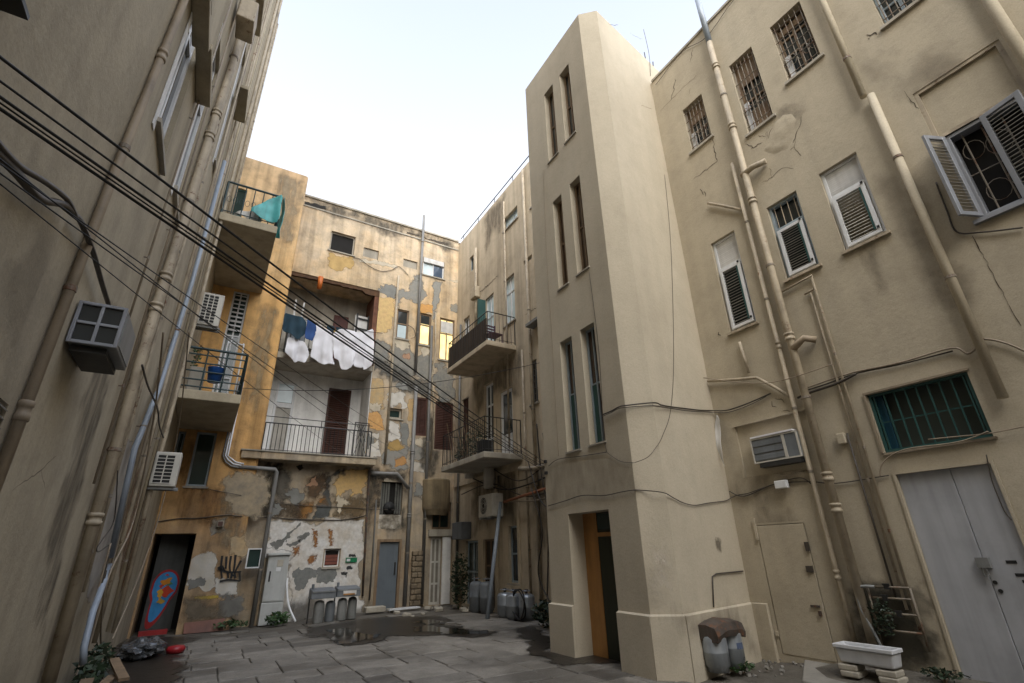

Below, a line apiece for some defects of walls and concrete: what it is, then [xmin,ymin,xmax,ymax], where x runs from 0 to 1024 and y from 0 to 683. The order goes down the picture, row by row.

crack [747,123,801,180]
peeling [327,253,397,271]
crack [972,236,1021,325]
peeling [210,275,458,622]
peeling [186,551,245,618]